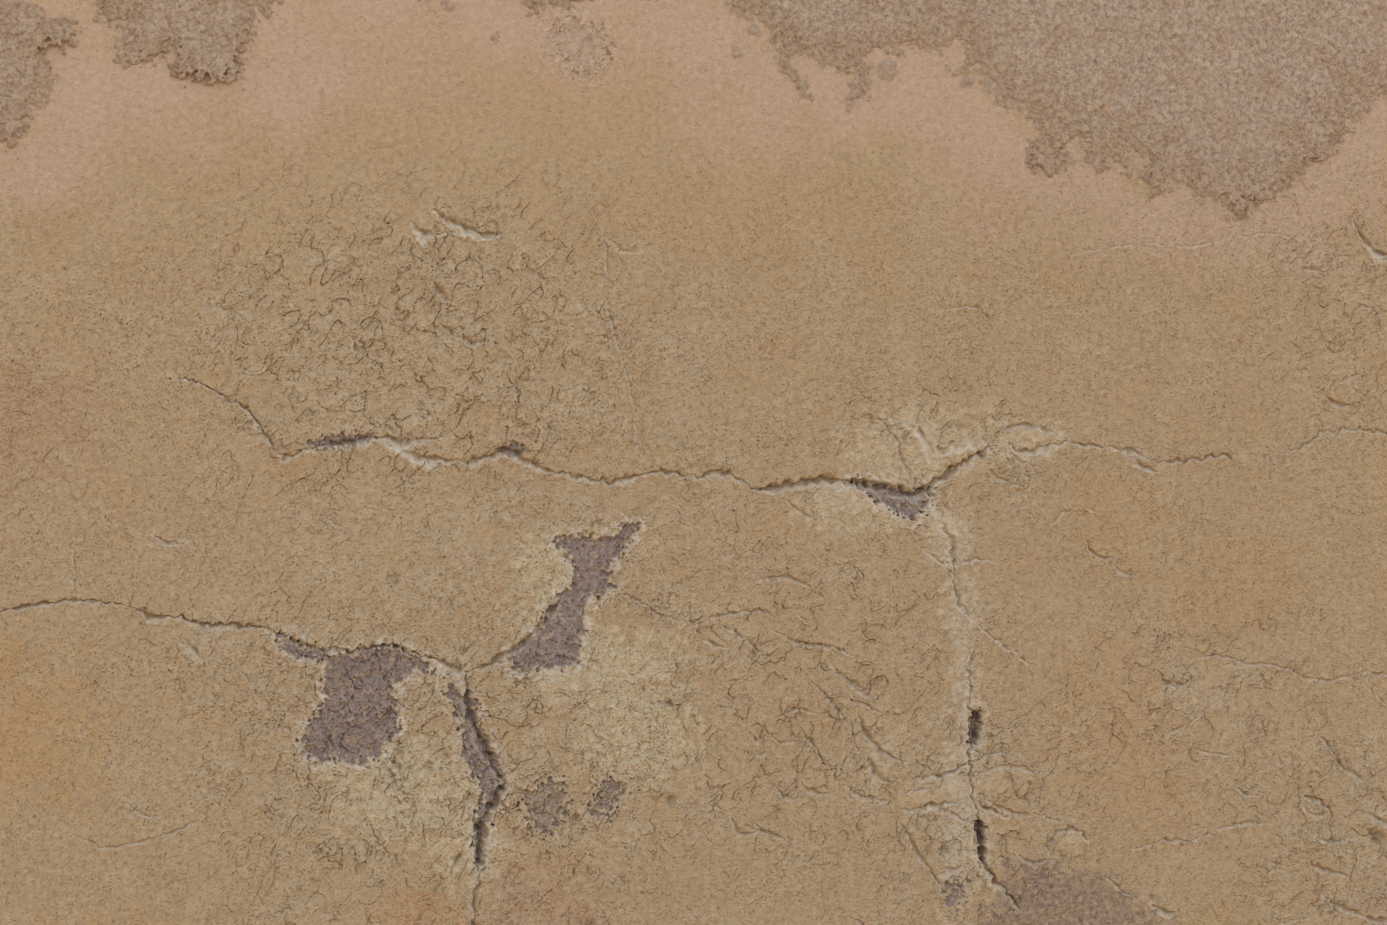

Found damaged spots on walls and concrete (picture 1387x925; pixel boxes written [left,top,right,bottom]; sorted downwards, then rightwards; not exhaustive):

flaking render [0,0,284,160]
peeling [523,0,630,96]
flaking render [724,0,1387,222]
flaking render [413,232,429,249]
flaking render [445,221,487,246]
crack [1350,216,1387,259]
crack [136,524,195,550]
spalling [493,505,653,687]
crack [171,369,1387,925]
crack [0,540,566,925]
spalling [262,620,647,882]